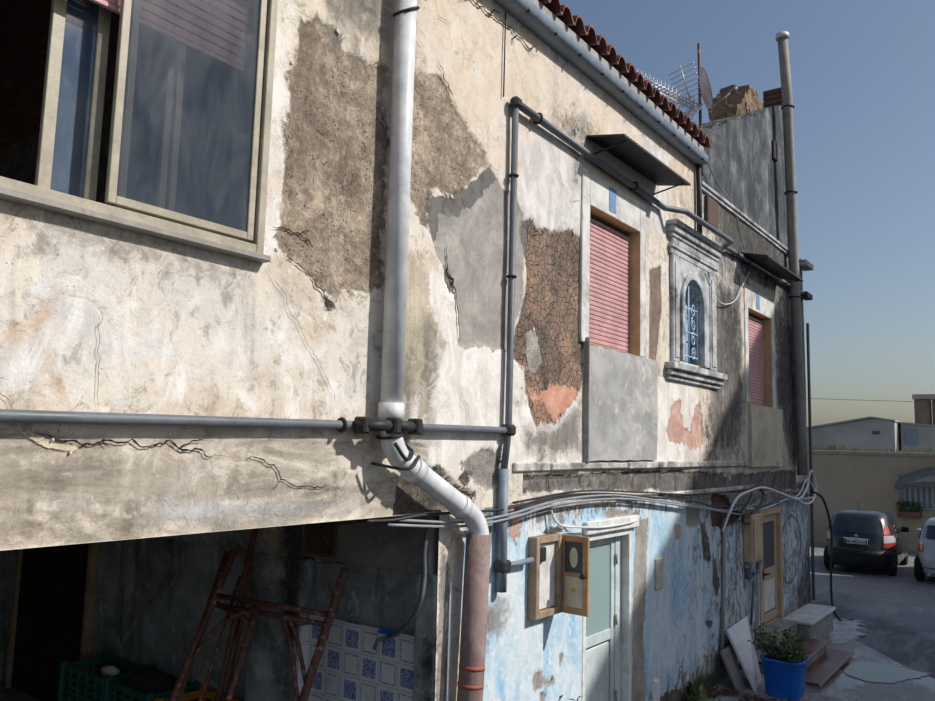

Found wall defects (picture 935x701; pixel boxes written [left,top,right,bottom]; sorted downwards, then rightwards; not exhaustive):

crack [464,0,538,56]
spalling [273,8,390,310]
spalling [410,71,492,228]
crack [96,310,104,406]
crack [266,226,341,408]
crack [444,247,460,343]
spalling [512,216,584,429]
crack [35,430,338,493]
peeling [667,399,704,451]
flaking render [674,493,740,596]
flaking render [604,505,649,701]
peeling [532,670,555,701]